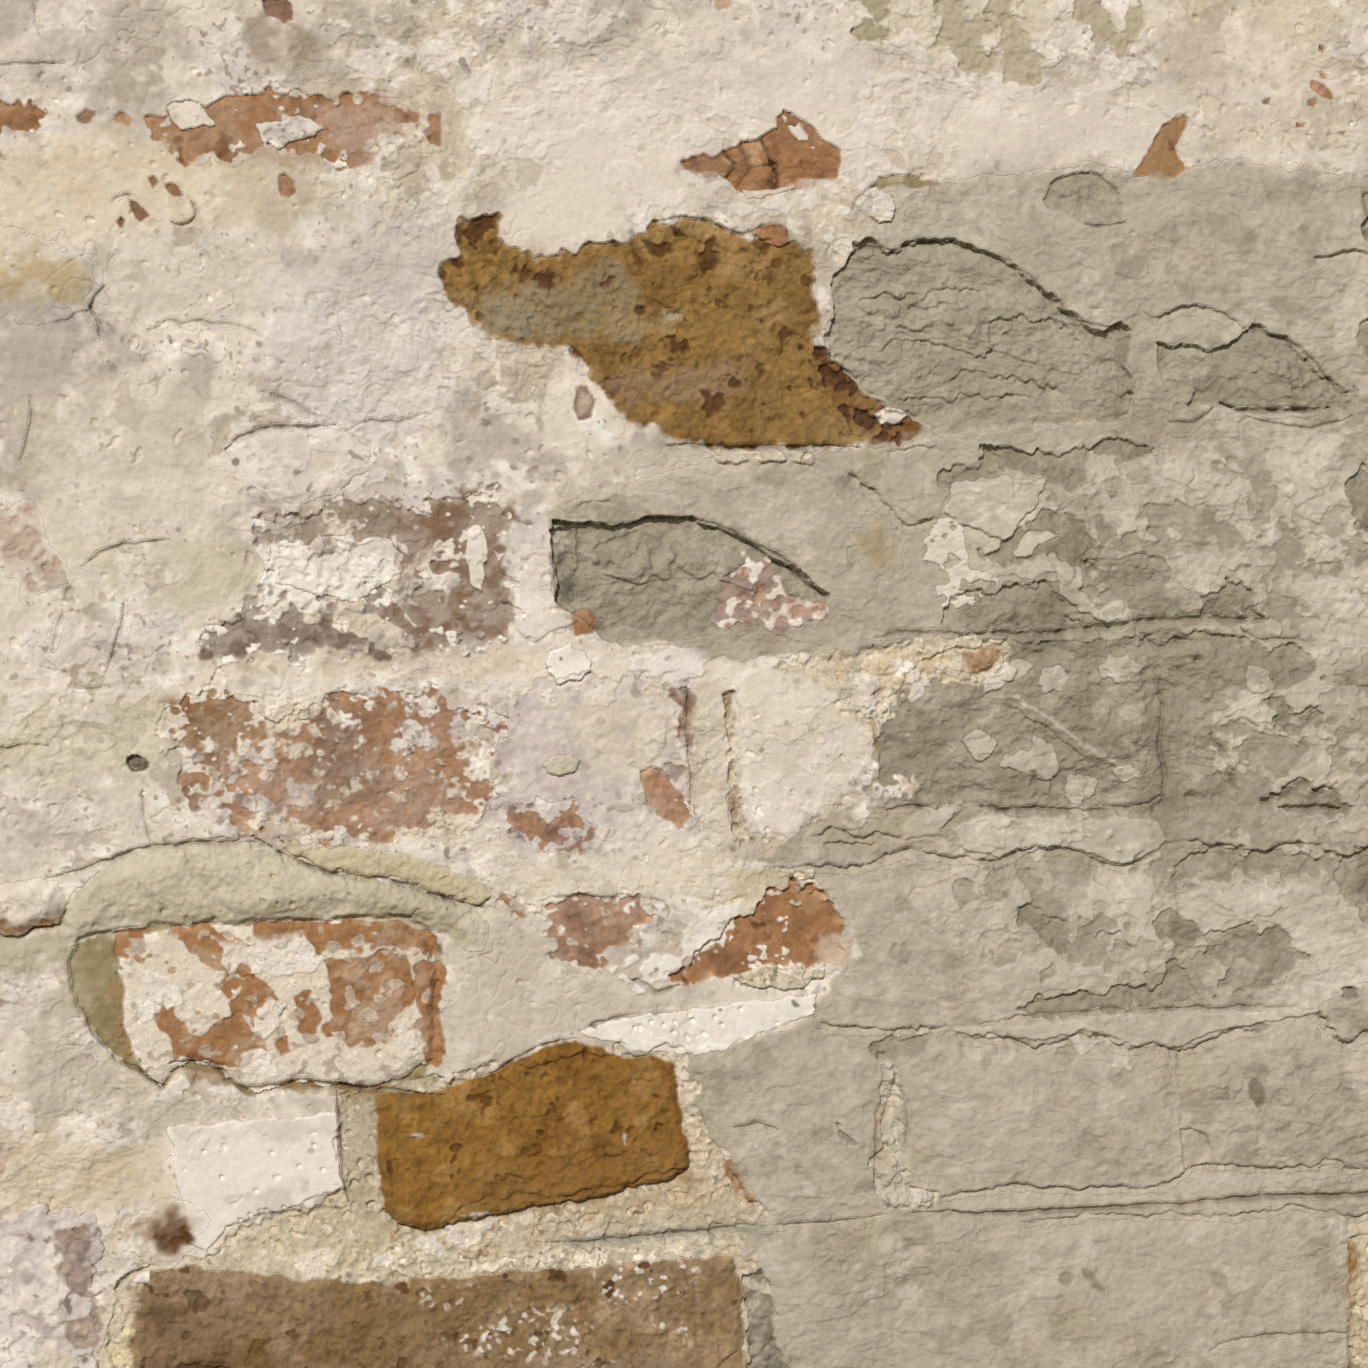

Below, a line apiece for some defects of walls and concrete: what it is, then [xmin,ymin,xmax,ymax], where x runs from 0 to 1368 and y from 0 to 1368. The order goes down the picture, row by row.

flaking render [114,85,442,172]
flaking render [681,110,843,199]
spalling [1151,304,1360,428]
flaking render [437,171,1325,820]
peeling [154,482,831,866]
crack [45,791,486,909]
crack [771,802,1368,878]
peeling [499,892,657,970]
spalling [668,873,847,991]
peeling [1016,902,1313,1023]
crack [813,1002,1320,1059]
flaking render [68,916,790,1368]